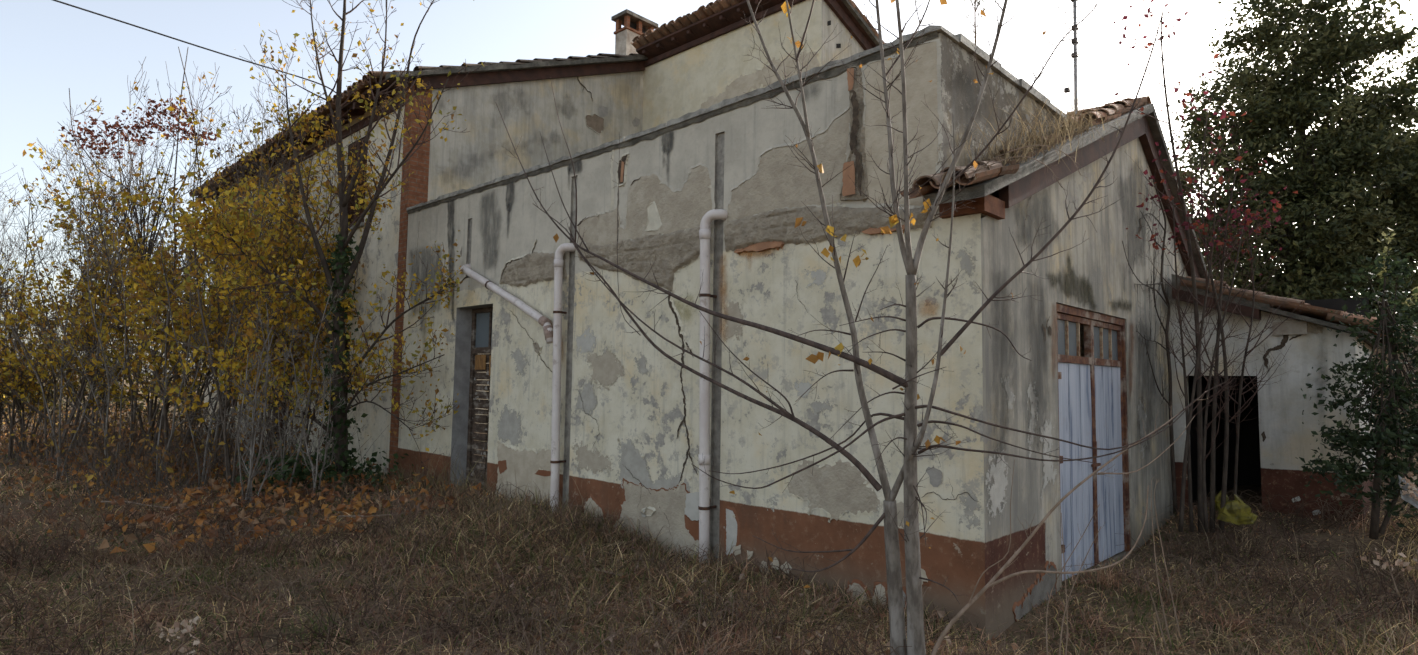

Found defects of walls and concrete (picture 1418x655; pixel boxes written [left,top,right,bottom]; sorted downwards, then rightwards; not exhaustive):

spalling [500,38,944,293]
water stain [1049,256,1095,308]
peeling [575,324,651,416]
peeling [471,371,699,560]
peeling [763,455,904,528]